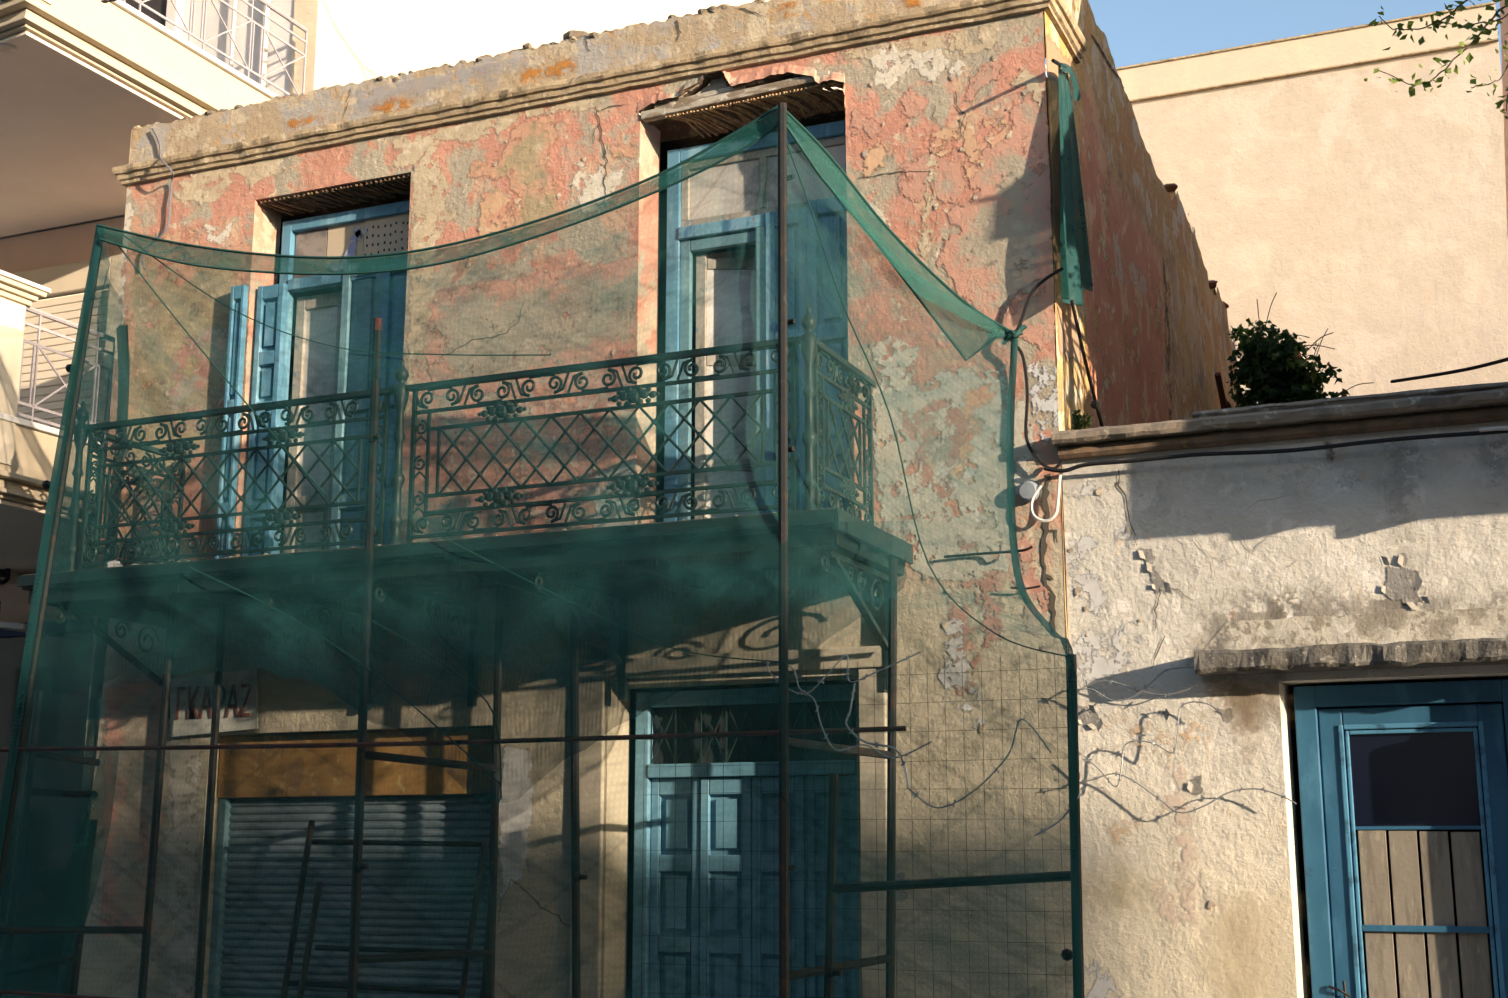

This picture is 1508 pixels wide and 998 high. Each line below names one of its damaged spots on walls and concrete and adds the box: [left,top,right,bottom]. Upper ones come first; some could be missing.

crack [593,104,624,195]
peeling [637,24,1184,733]
crack [1041,473,1058,631]
crack [1116,470,1137,545]